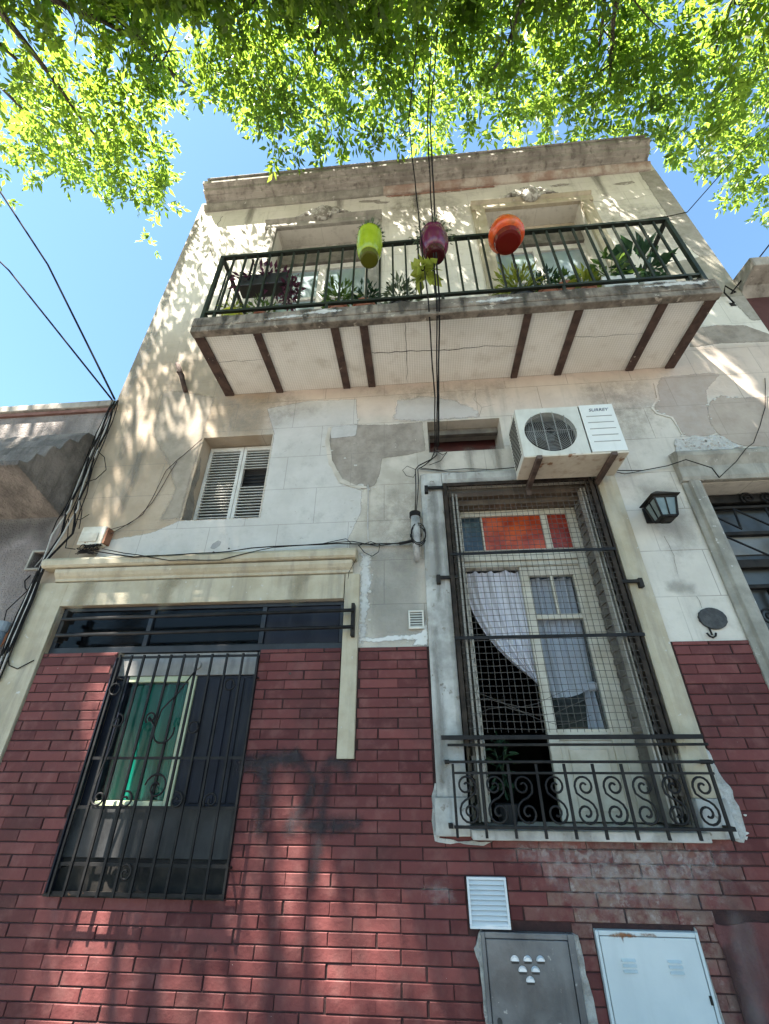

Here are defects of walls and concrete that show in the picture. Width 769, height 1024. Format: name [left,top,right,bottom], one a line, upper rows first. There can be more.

flaking render [651,373,769,451]
flaking render [322,422,425,491]